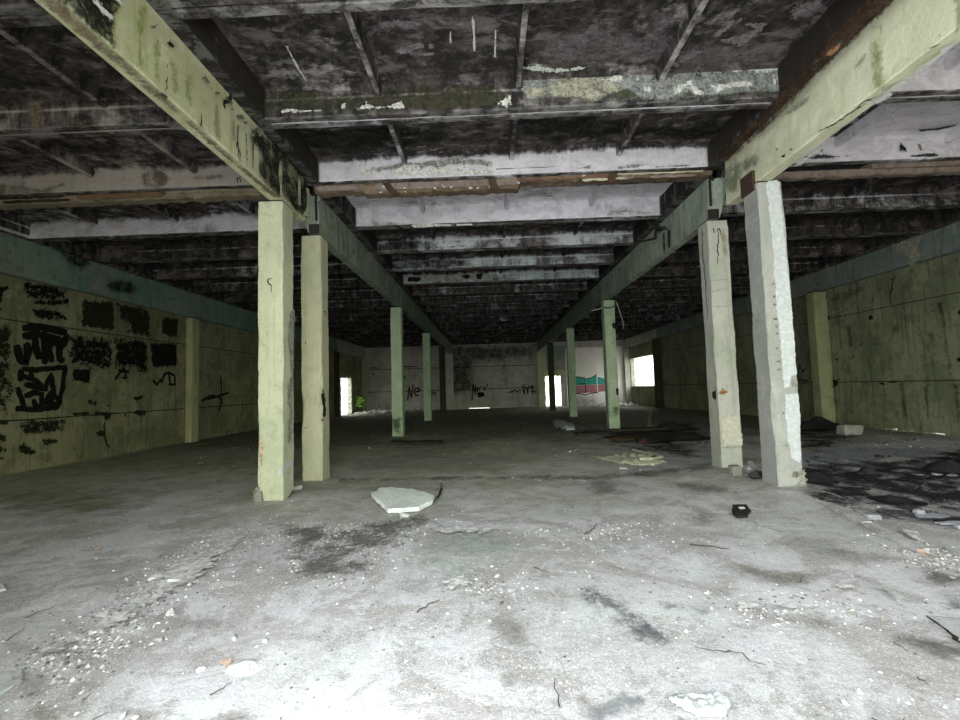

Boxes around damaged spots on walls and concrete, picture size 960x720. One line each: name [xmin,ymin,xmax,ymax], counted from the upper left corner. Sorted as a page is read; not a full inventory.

damp [43,0,283,197]
efflorescence [341,101,405,110]
damp [523,70,779,101]
peeling [766,180,821,478]
crack [694,646,766,665]